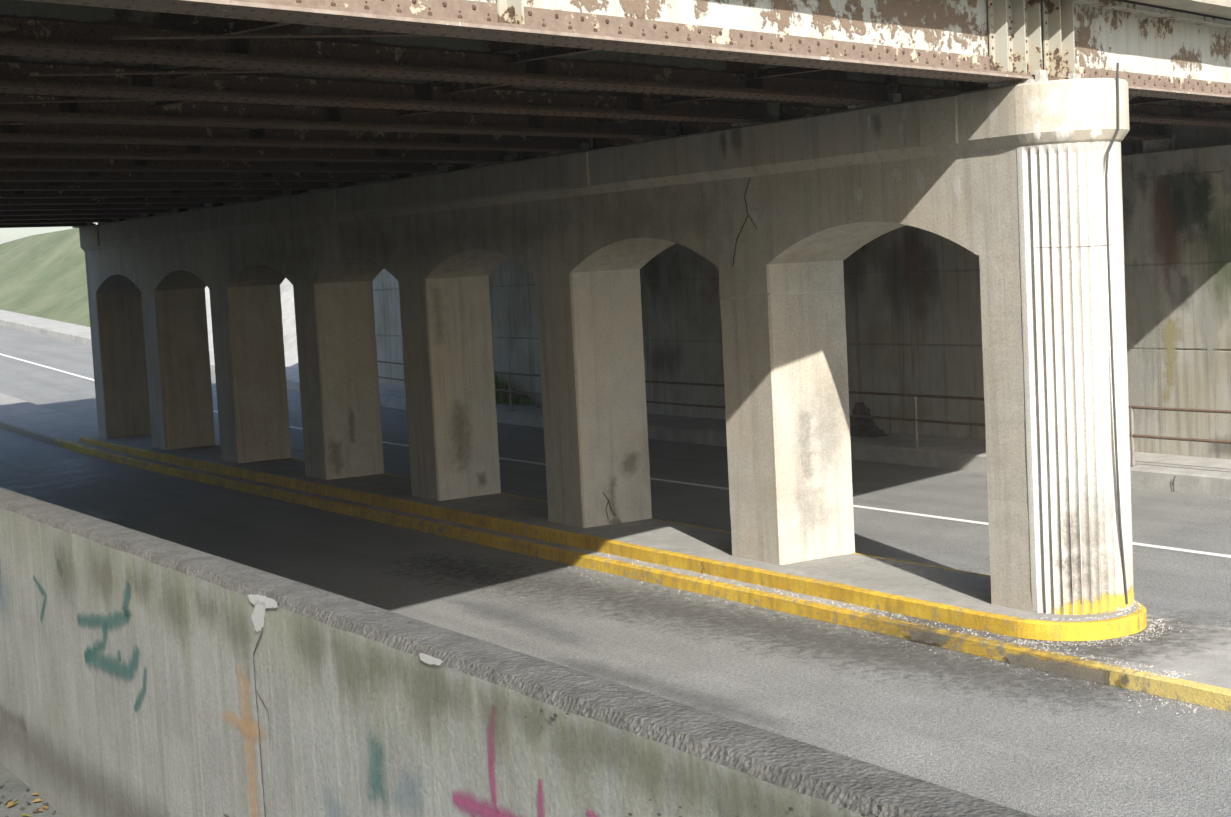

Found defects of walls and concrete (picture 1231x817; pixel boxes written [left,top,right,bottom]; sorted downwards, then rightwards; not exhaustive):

peeling [570,0,672,19]
peeling [694,0,989,56]
peeling [1074,5,1118,69]
peeling [1171,31,1231,74]
crack [733,177,758,265]
damp [640,256,669,303]